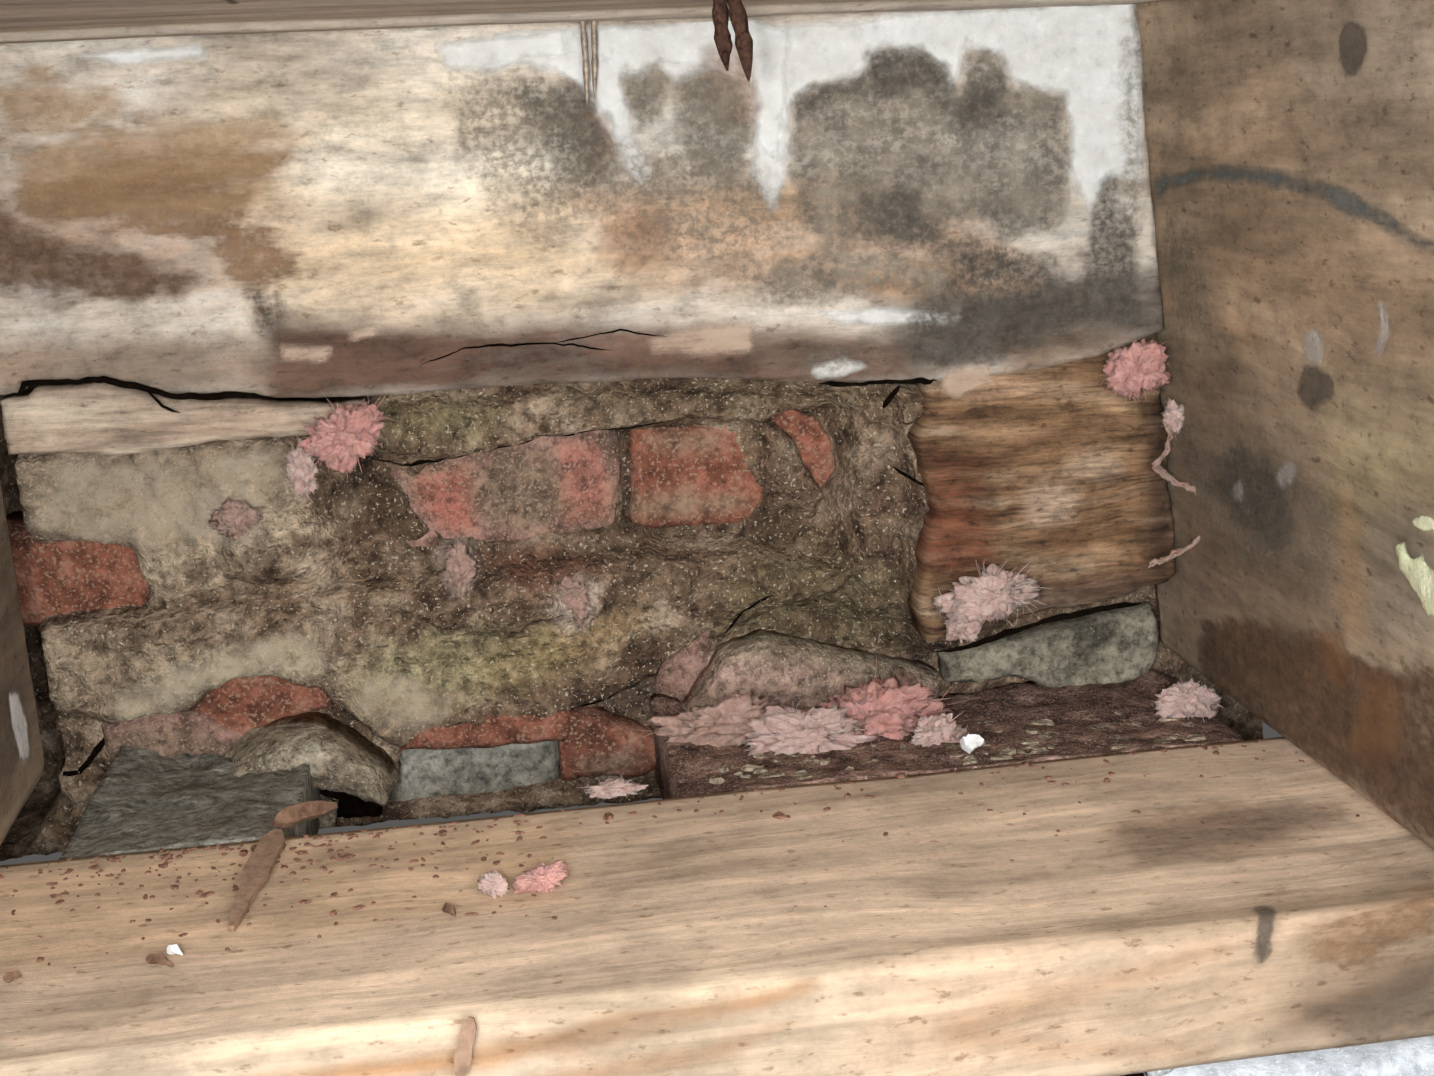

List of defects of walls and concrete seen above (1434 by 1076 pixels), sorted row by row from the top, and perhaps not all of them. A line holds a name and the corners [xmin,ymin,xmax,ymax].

damp [2,90,107,130]
damp [0,128,298,332]
mould [463,83,606,213]
mould [627,68,788,266]
damp [760,50,1139,361]
damp [1154,166,1432,245]
crack [0,376,278,413]
crack [709,596,771,638]
crack [570,671,658,711]